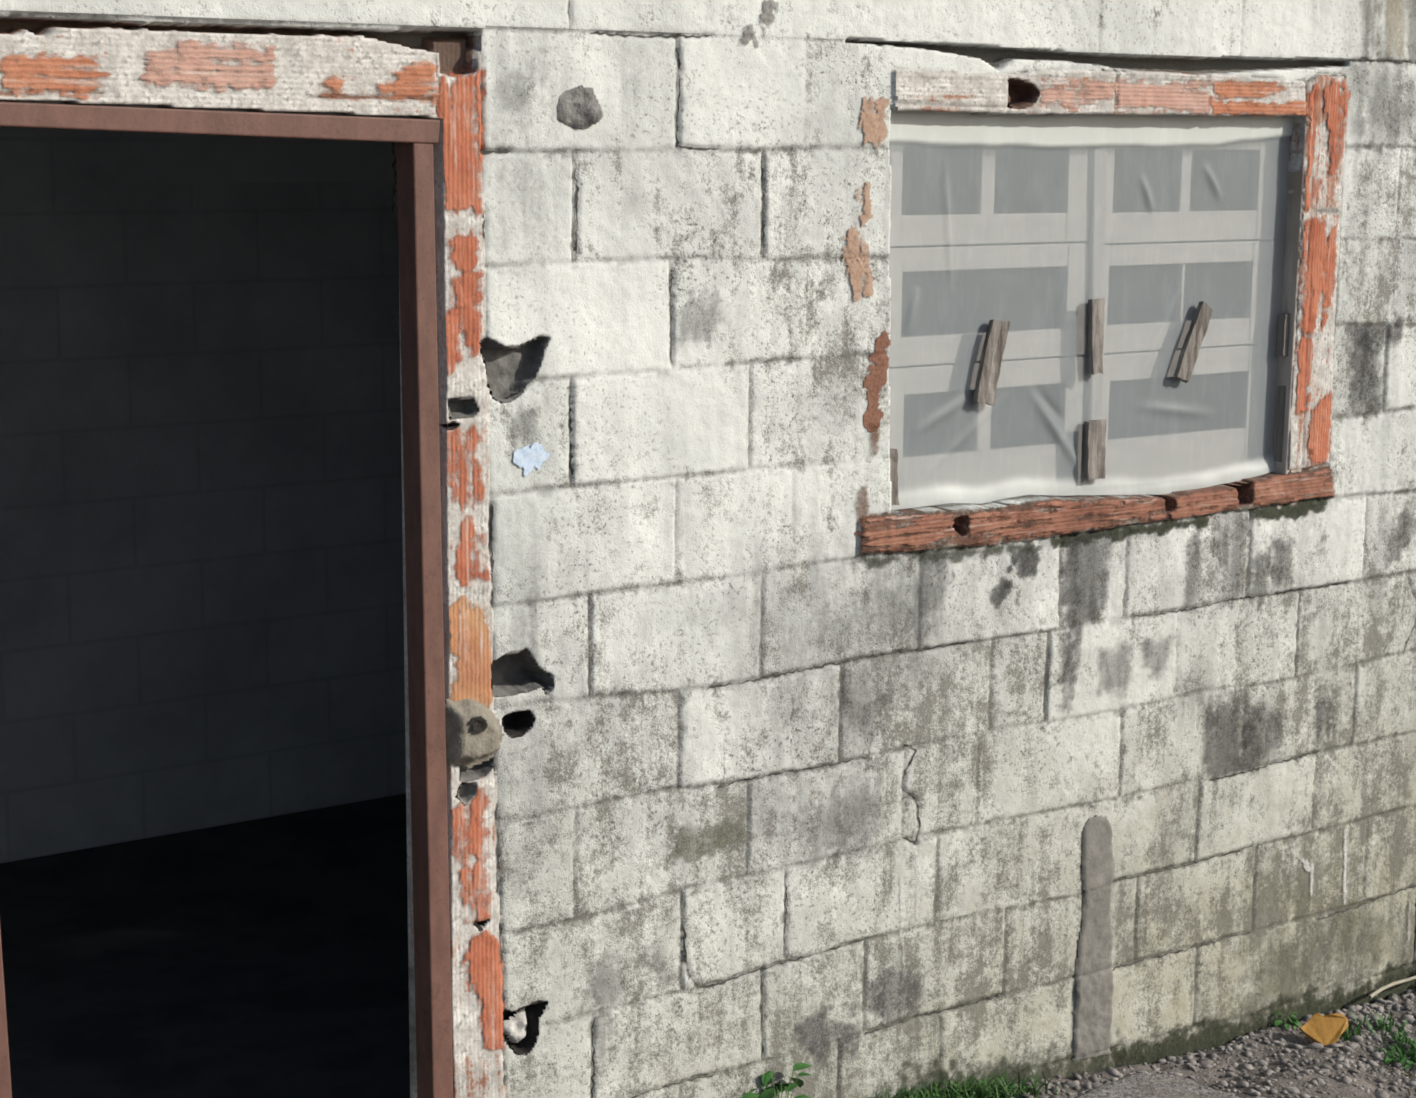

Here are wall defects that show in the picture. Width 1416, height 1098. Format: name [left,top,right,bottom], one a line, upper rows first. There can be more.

flaking render [0,51,111,100]
flaking render [140,39,277,92]
flaking render [378,60,487,217]
flaking render [856,75,1351,554]
leakage [1349,317,1404,411]
flaking render [441,233,554,738]
leakage [1390,511,1409,561]
crack [717,757,867,788]
crack [901,744,921,845]
leakage [1204,695,1281,780]
leakage [1316,686,1335,738]
flaking render [452,755,548,1056]